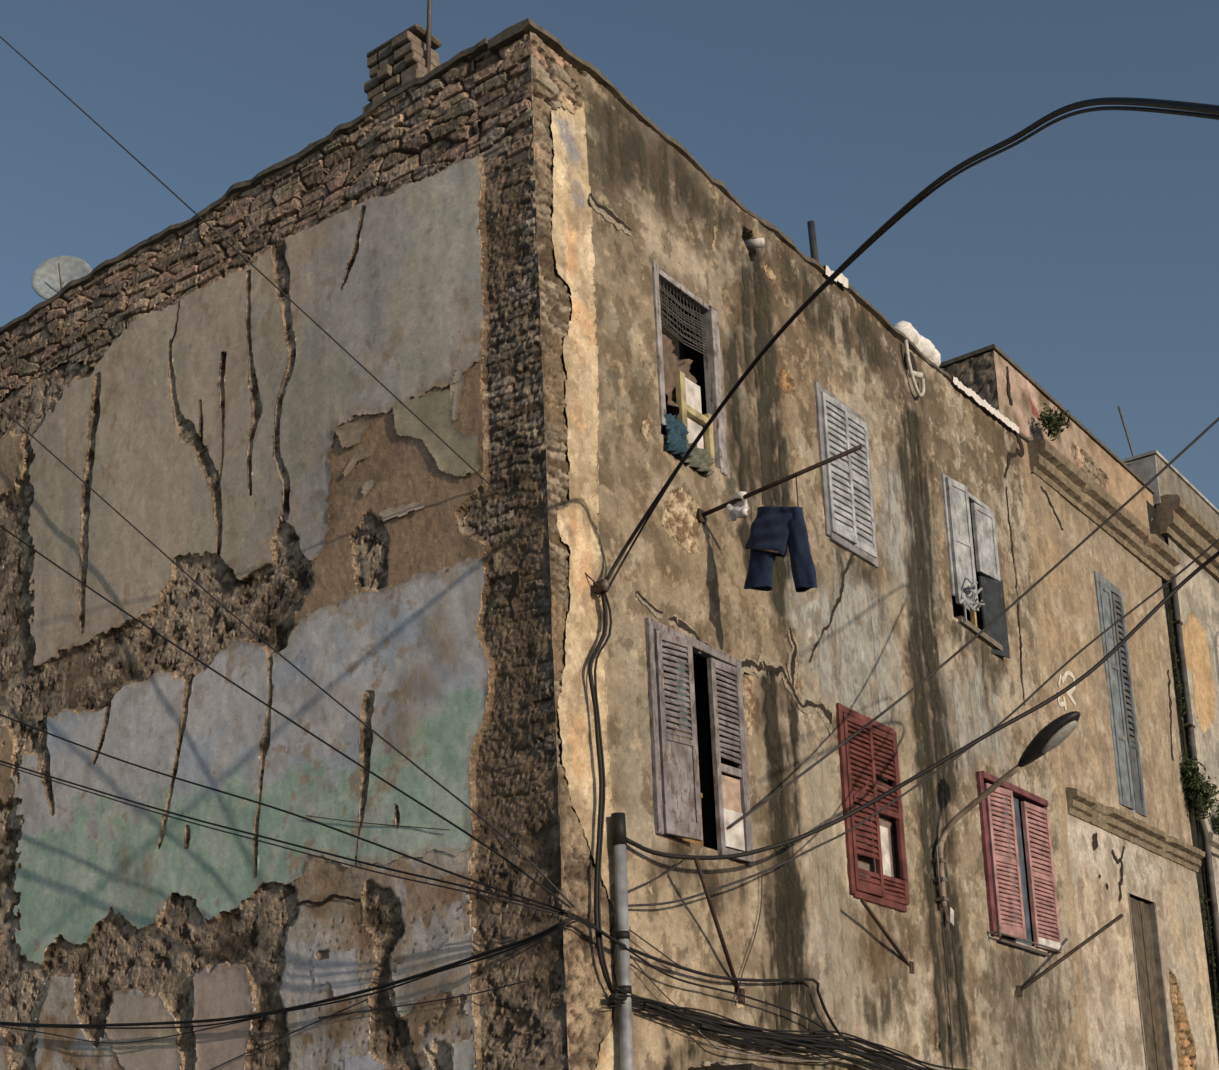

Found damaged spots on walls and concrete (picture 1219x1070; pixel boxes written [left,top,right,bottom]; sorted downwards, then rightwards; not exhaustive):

peeling [0,31,621,1070]
spalling [661,487,701,554]
crack [636,553,855,735]
damp [723,251,790,569]
damp [771,545,791,627]
damp [760,672,827,1045]
damp [897,408,971,1065]
spalling [1169,969,1197,1070]